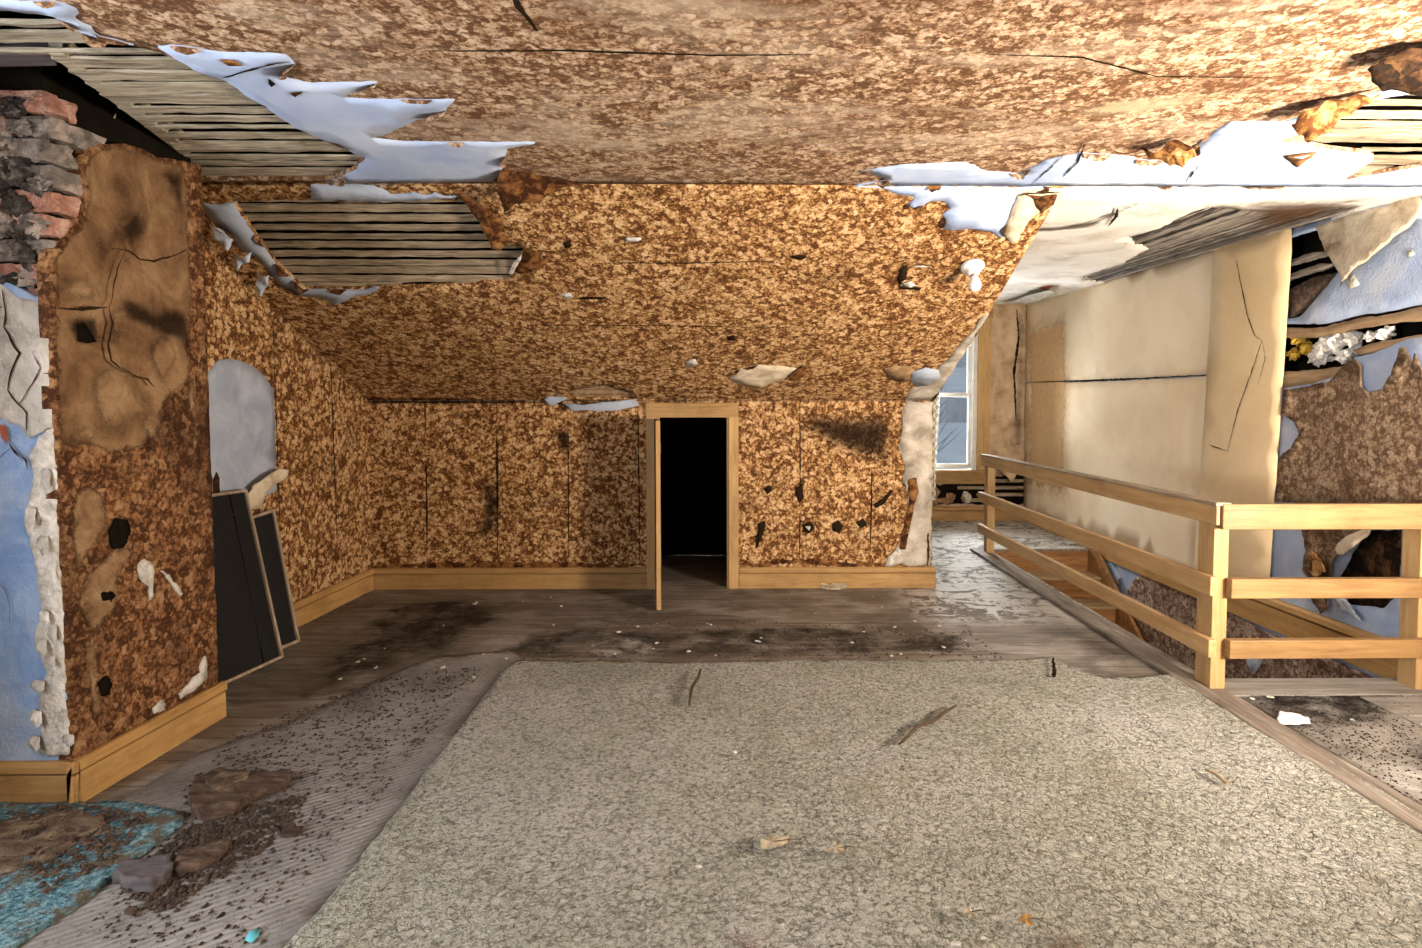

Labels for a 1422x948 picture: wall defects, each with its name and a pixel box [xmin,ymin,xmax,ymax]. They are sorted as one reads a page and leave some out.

water stain [125,218,143,238]
water stain [128,303,187,341]
flaking render [0,0,535,757]
peeling [884,313,1024,567]
peeling [855,90,1422,243]
crack [1211,260,1266,451]
spalling [1095,208,1422,388]
hole [1347,598,1394,608]
hole [1341,529,1402,577]